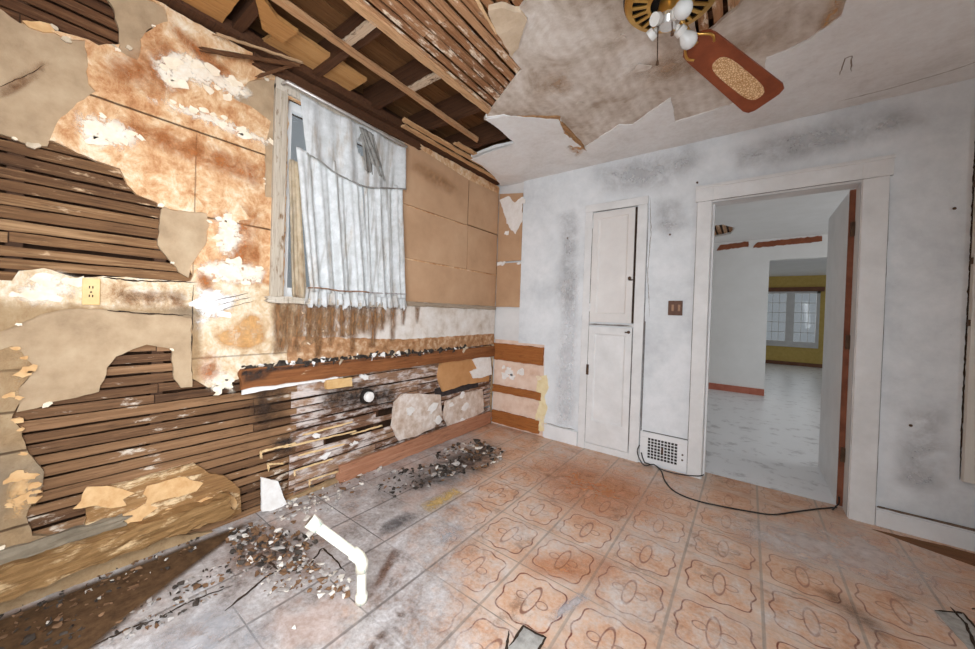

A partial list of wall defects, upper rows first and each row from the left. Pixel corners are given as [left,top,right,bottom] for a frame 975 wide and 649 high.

flaking render [688,0,846,69]
flaking render [359,0,733,176]
flaking render [0,0,549,534]
spalling [505,625,547,649]
spalling [934,608,975,649]